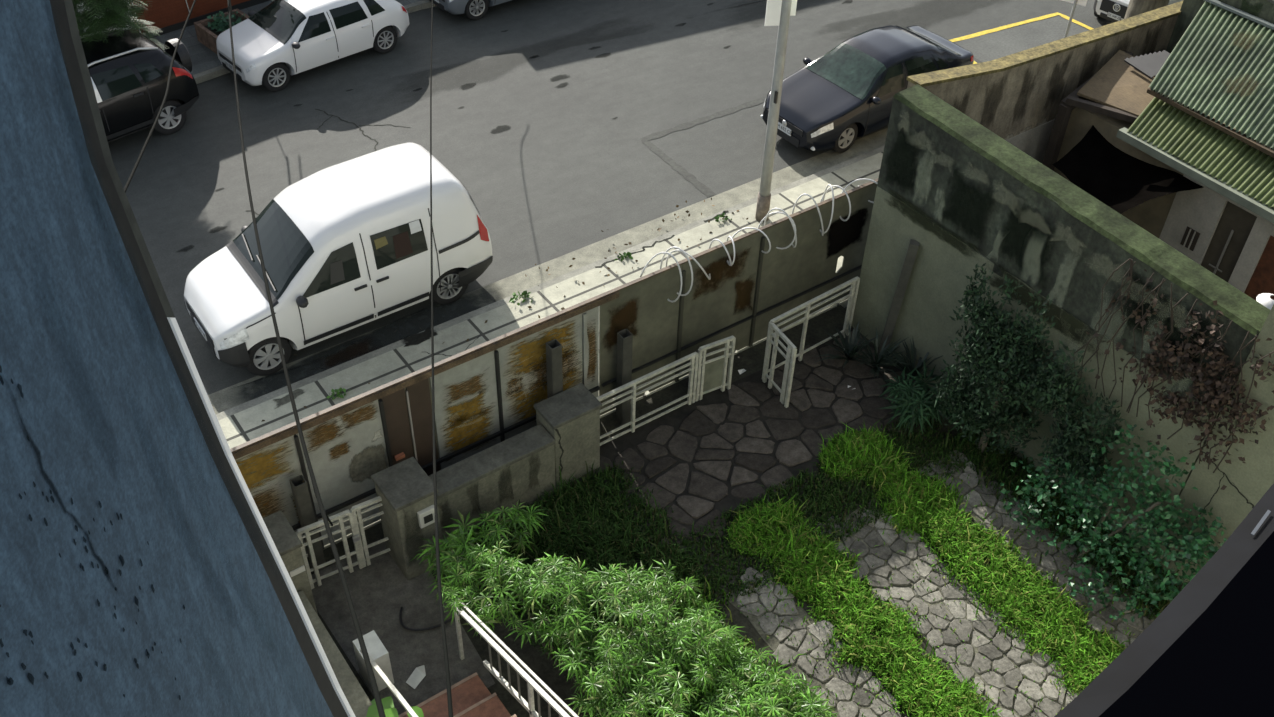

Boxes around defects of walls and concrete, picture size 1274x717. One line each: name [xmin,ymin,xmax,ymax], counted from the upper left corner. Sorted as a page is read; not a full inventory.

corrosion [694,249,754,312]
corrosion [444,370,493,462]
corrosion [506,300,638,421]
crack [14,399,111,580]